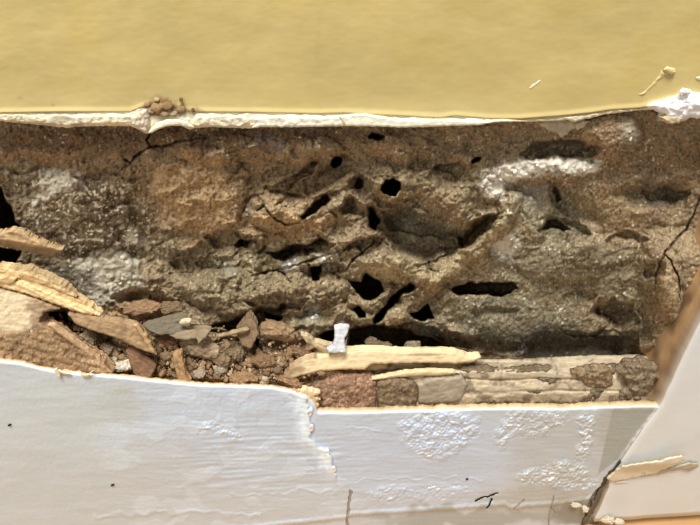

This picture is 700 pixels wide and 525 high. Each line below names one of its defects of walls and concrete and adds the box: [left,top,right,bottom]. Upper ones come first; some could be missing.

crack [119,133,207,173]
spalling [0,107,684,138]
crack [654,195,700,301]
peeling [492,408,699,493]